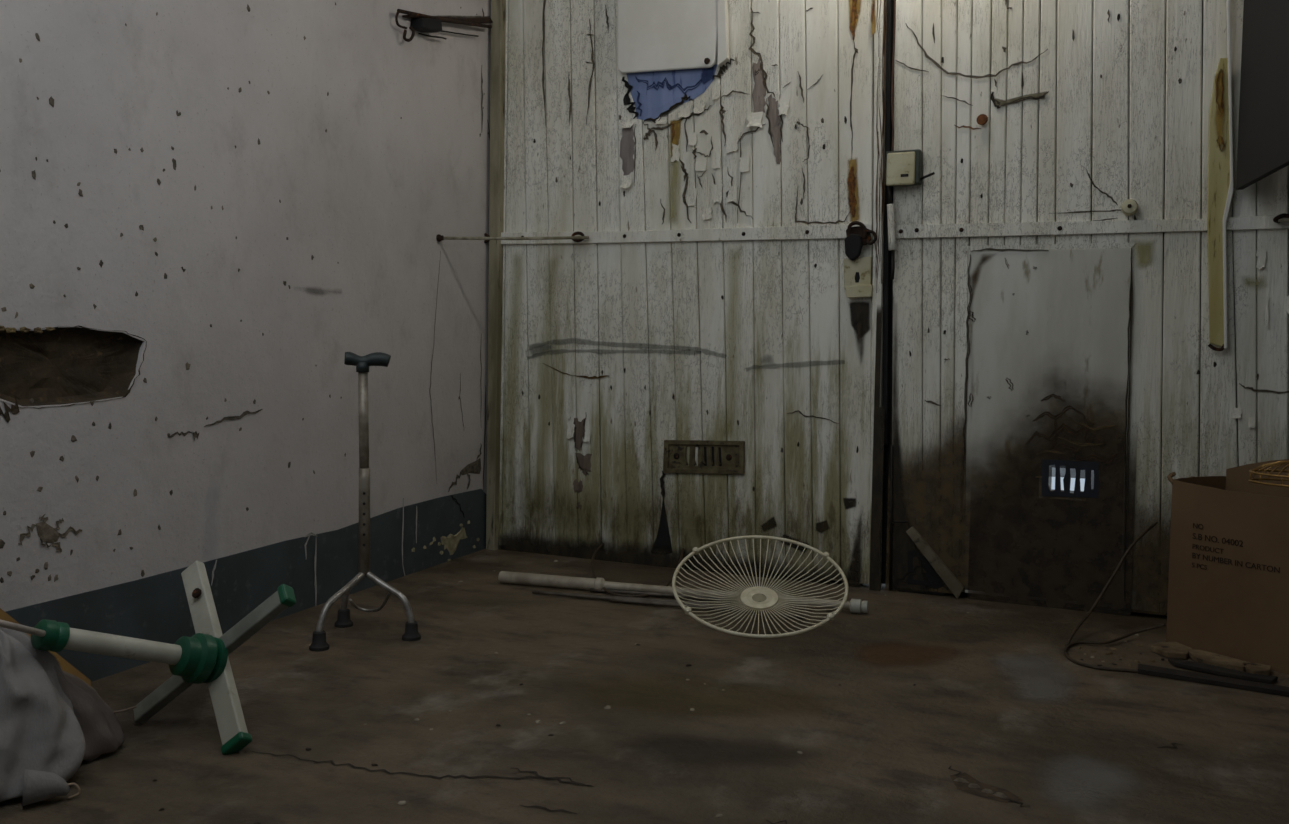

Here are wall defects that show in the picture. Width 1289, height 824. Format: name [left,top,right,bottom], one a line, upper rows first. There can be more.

peeling [619,58,735,197]
peeling [746,9,797,164]
rust [847,159,859,222]
rust [849,0,886,293]
rust [1215,69,1225,149]
flaking render [0,307,147,429]
flaking render [449,445,482,490]
leakage [500,302,928,592]
peeling [412,521,480,561]
leakage [1131,518,1171,616]
crack [252,751,594,814]